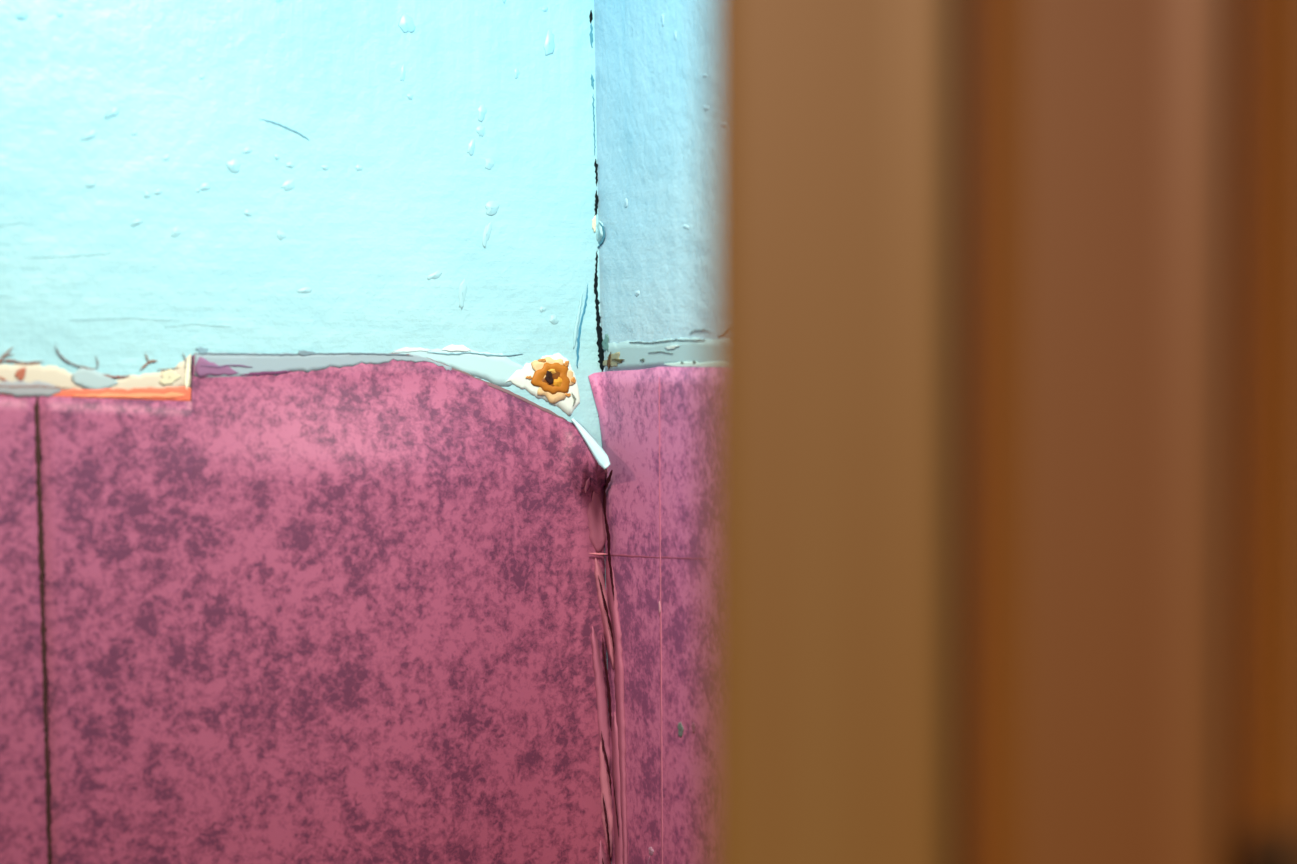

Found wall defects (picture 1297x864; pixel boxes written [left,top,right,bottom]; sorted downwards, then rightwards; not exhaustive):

crack [572,10,708,417]
flaking render [505,353,580,416]
corrosion [526,357,576,404]